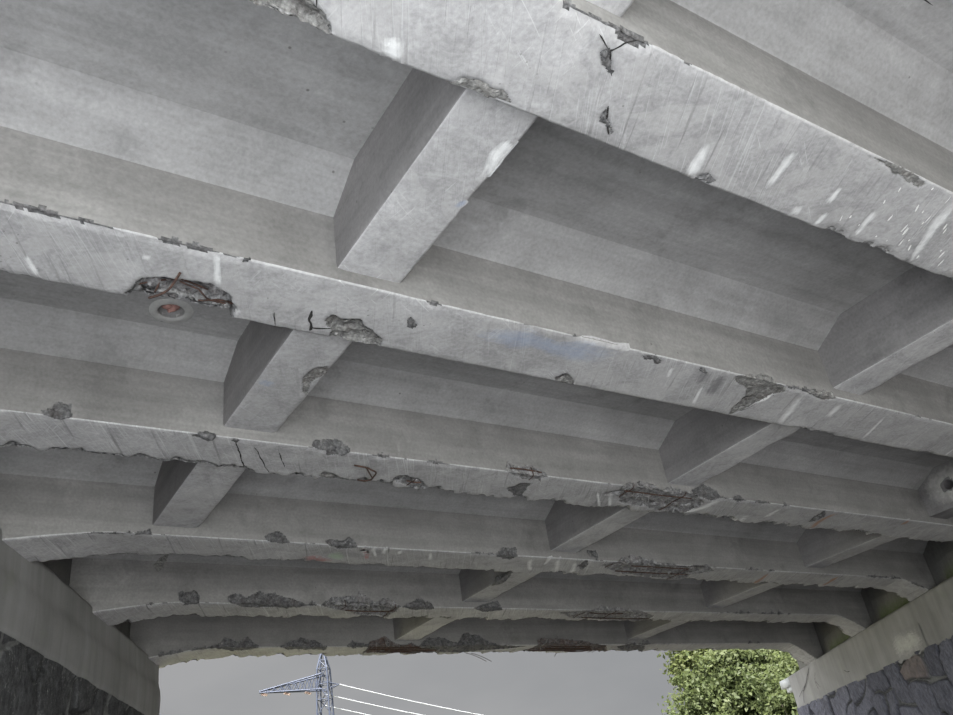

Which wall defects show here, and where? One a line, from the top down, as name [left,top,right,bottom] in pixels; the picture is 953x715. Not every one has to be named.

spalling [249,0,332,35]
spalling [600,48,614,74]
spalling [127,272,236,317]
spalling [325,315,382,346]
spalling [728,373,786,415]
spalling [604,481,721,513]
spalling [578,550,714,579]
spalling [228,591,309,609]
spalling [324,591,434,617]
spalling [560,605,654,621]
spalling [347,633,645,662]